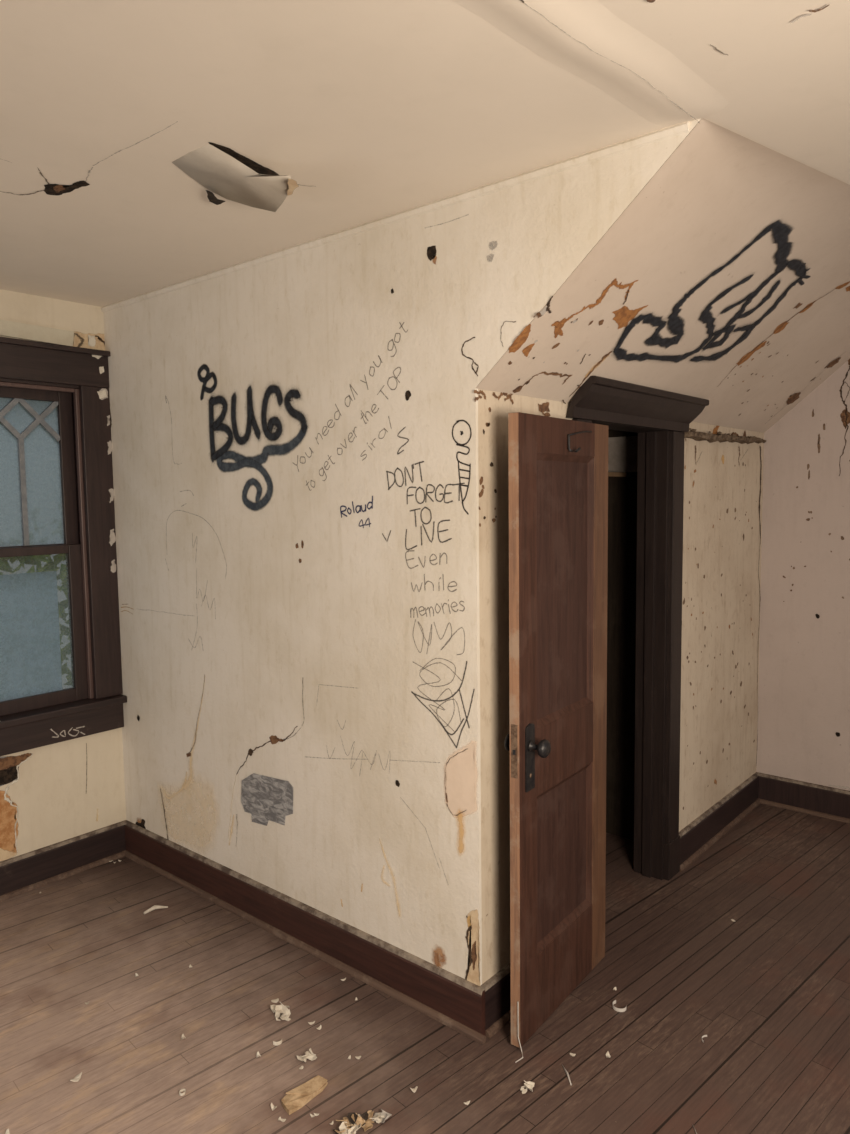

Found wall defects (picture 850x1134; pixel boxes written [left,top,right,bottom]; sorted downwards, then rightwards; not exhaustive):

peeling [172,142,305,212]
peeling [508,278,648,365]
crack [773,353,850,476]
spalling [0,753,33,861]
peeling [160,675,205,839]
crack [228,680,304,843]
peeling [444,741,478,852]
spalling [465,910,480,986]